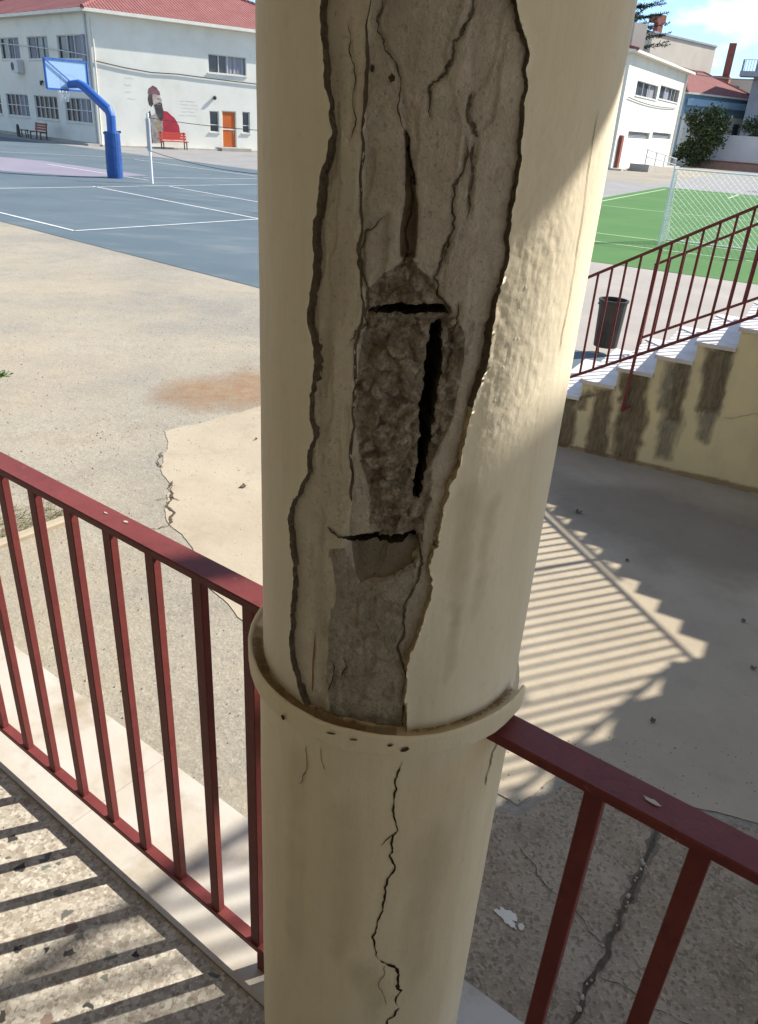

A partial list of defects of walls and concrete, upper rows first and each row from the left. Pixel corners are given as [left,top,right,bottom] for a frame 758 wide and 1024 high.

crack [157,452,176,524]
spalling [287,0,530,732]
damp [557,363,689,461]
damp [696,349,732,441]
crack [371,764,403,1024]
crack [569,827,661,1024]